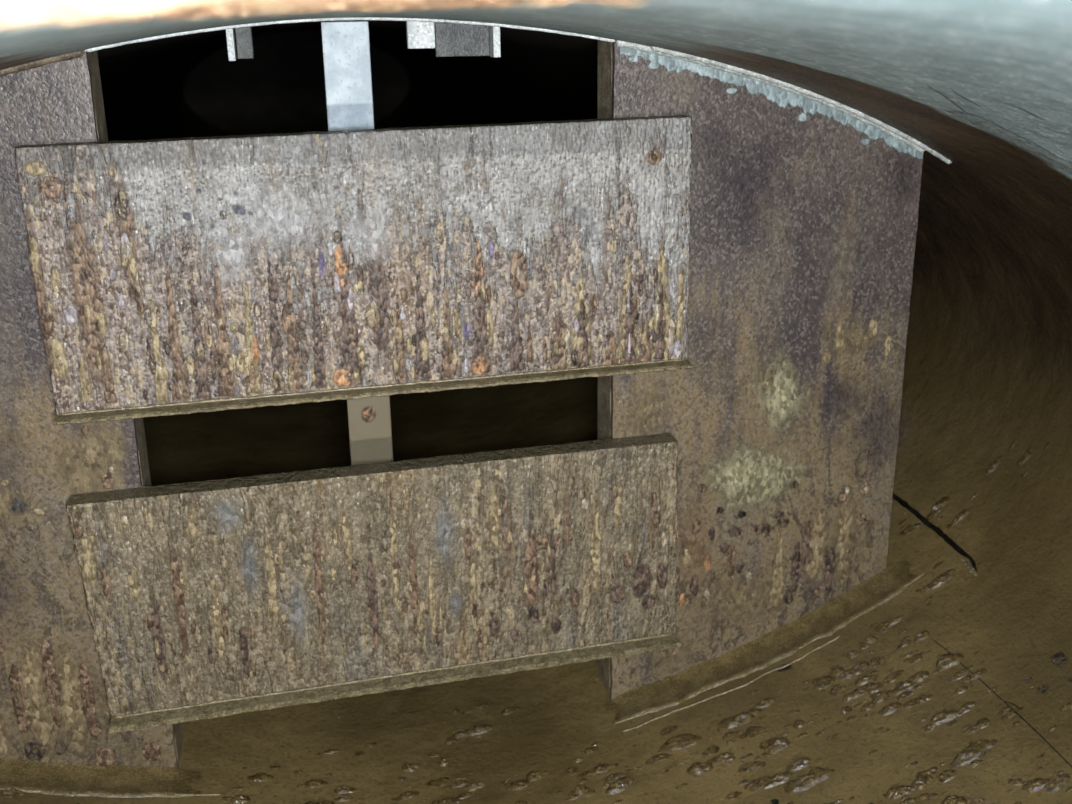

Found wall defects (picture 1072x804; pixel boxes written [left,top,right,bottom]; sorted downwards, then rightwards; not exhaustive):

corrosion [647,149,662,165]
peeling [620,47,923,159]
corrosion [109,191,684,403]
water stain [763,359,801,426]
water stain [698,451,800,518]
corrosion [147,607,166,676]
corrosion [208,571,254,680]
corrosion [264,526,287,636]
corrosion [309,511,442,649]
corrosion [489,484,574,616]
corrosion [755,482,871,608]
corrosion [9,639,116,766]